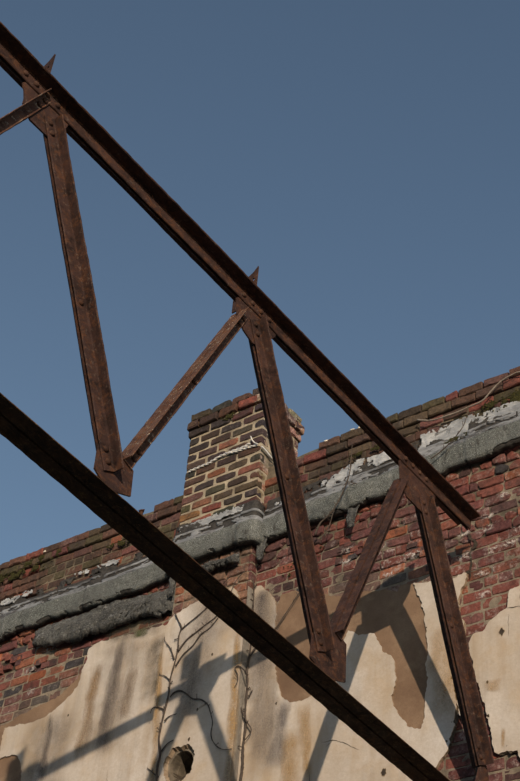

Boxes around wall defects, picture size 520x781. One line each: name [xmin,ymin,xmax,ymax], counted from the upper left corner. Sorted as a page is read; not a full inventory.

peeling [74,559,120,575]
peeling [0,589,33,606]
flaking render [276,591,310,658]
flaking render [325,594,342,621]
flaking render [343,582,428,729]
flaking render [0,672,82,746]
damp [86,671,100,721]
damp [102,655,120,730]
corrosion [229,645,239,742]
flaking render [275,667,311,705]
flaking render [0,755,22,781]
spalling [164,737,195,781]